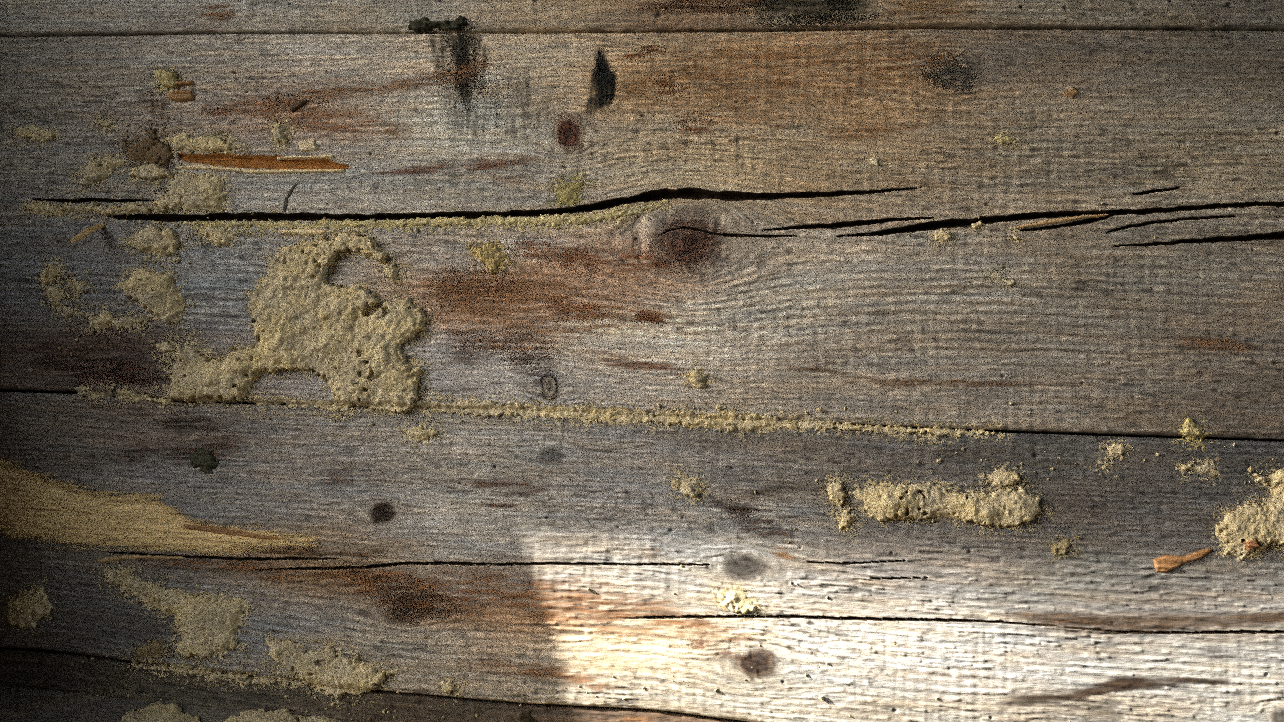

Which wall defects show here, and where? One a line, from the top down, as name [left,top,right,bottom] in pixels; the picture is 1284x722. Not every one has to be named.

peeling [166,81,195,103]
peeling [288,100,307,112]
spalling [129,153,349,182]
crack [32,183,1284,247]
peeling [42,280,87,318]